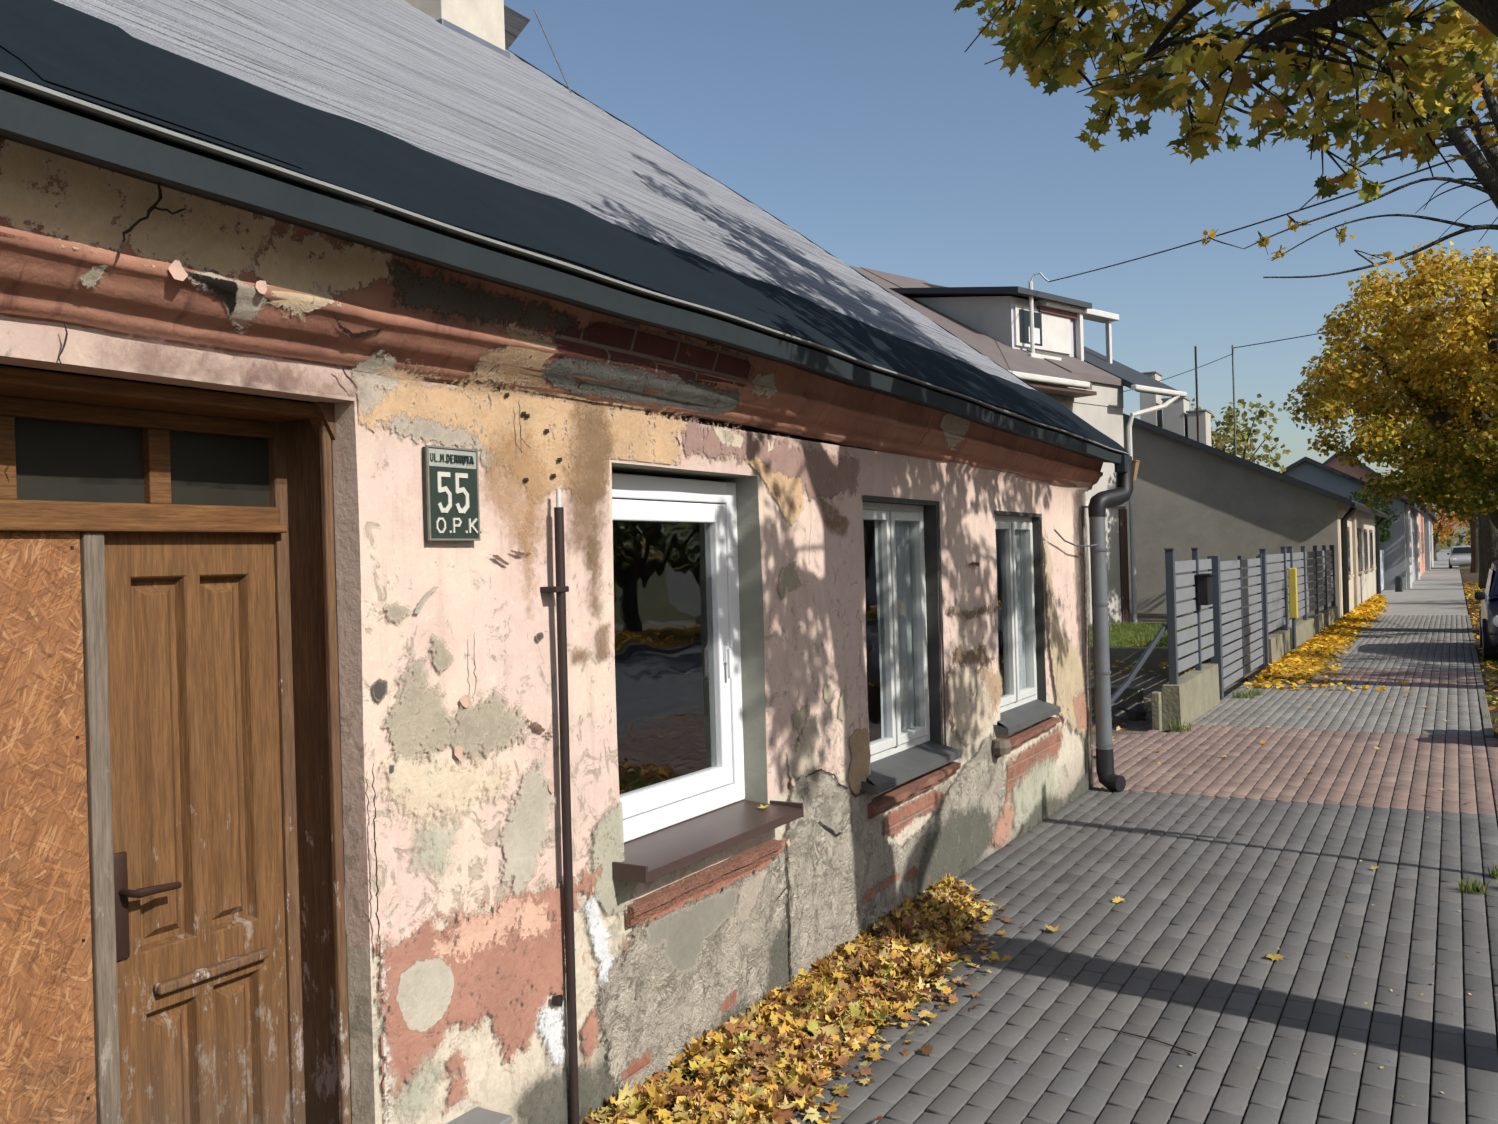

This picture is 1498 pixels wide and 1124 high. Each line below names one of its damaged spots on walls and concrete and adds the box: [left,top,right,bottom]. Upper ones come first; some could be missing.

crack [119,183,186,253]
flaking render [0,139,778,501]
flaking render [714,426,805,525]
peeling [385,602,412,624]
peeling [372,634,562,970]
flaking render [590,527,1090,1091]
peeling [380,933,391,1012]
flaking render [552,995,563,1007]